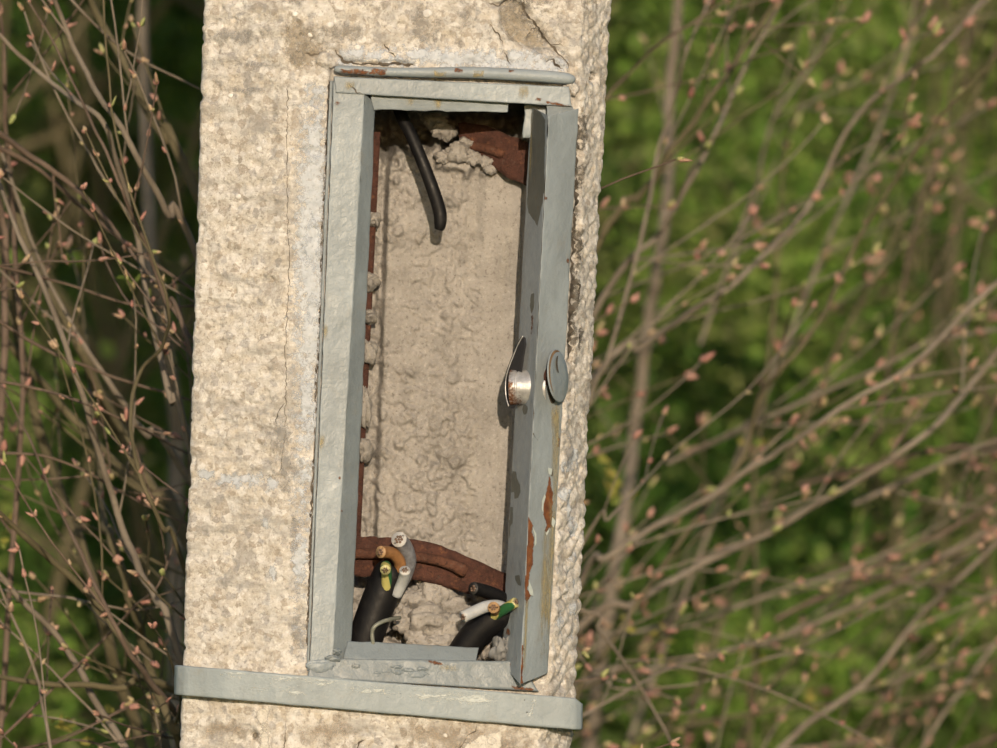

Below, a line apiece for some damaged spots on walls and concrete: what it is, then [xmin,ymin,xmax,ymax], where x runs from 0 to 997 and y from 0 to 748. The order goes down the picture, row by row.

crack [489,0,569,69]
rust [409,539,506,600]